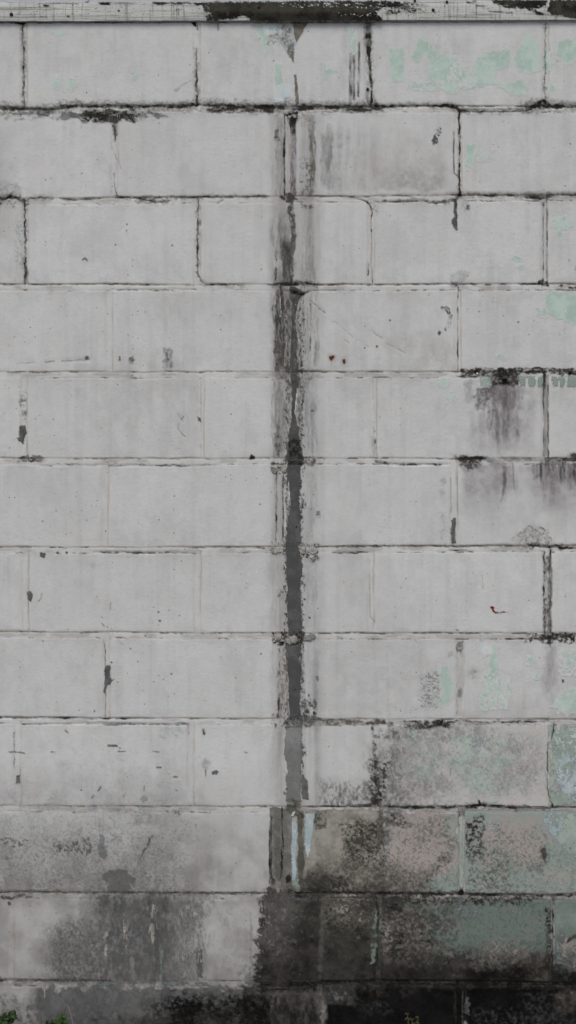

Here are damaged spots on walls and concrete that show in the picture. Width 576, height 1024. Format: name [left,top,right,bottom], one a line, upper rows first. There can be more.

peeling [388,32,576,97]
water stain [37,109,164,139]
water stain [272,117,316,649]
water stain [459,367,576,406]
water stain [459,455,491,469]
water stain [504,453,576,485]
peeling [269,286,309,893]
water stain [0,575,576,1024]